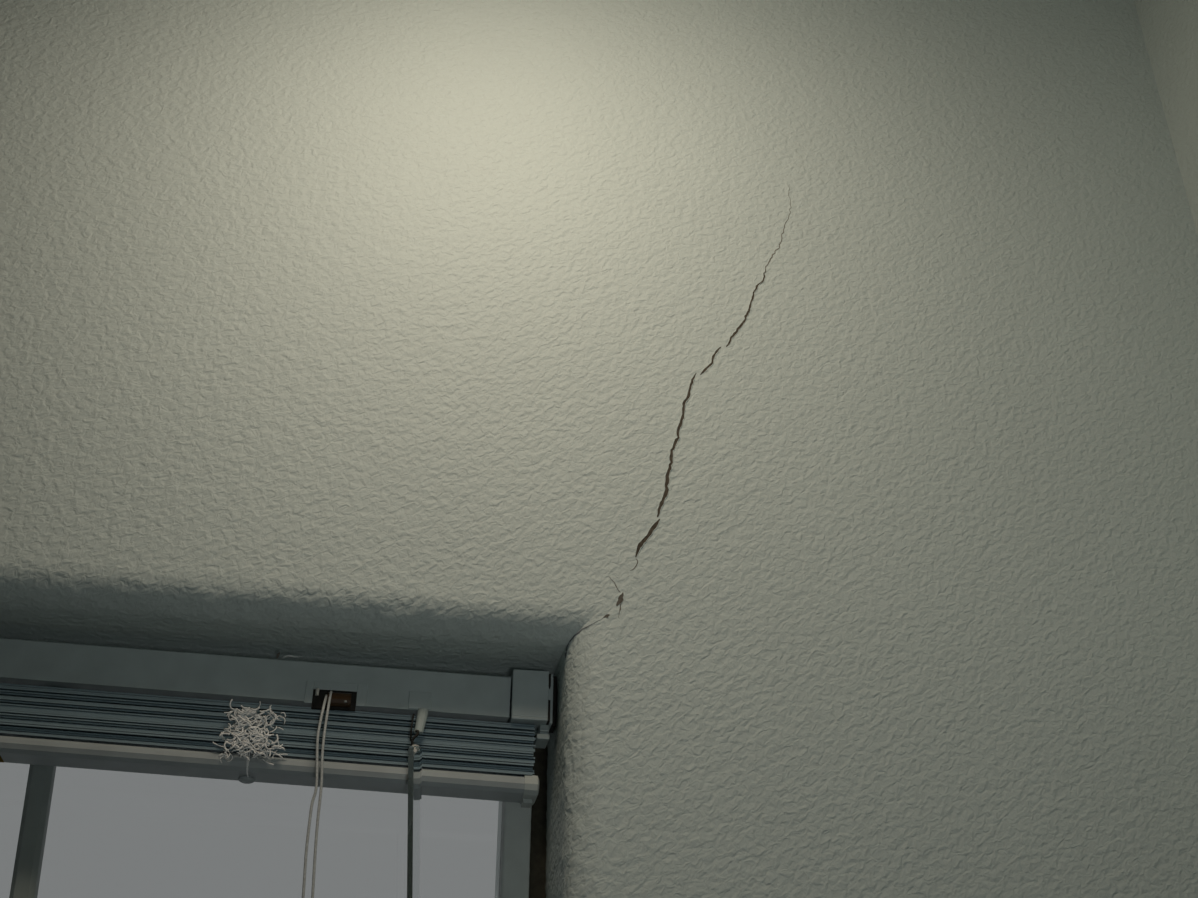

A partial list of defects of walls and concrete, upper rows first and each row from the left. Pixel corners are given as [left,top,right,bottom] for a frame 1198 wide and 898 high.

crack [564,184,792,658]